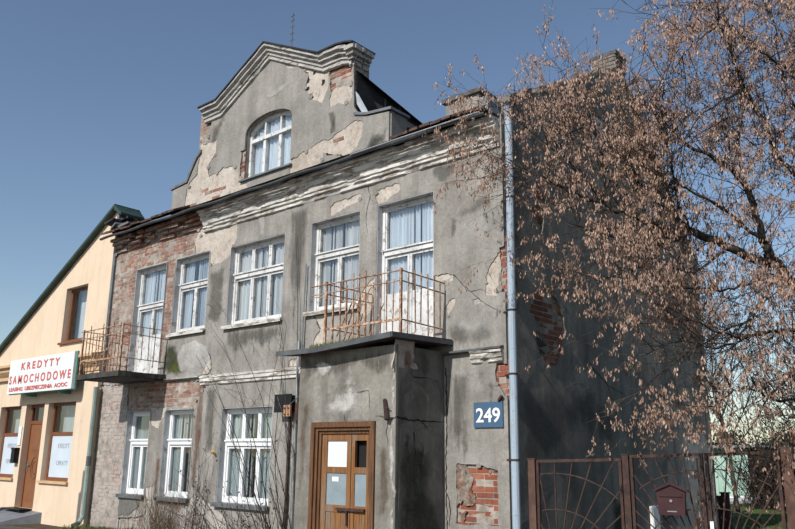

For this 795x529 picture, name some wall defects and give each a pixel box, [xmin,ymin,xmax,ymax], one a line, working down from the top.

peeling [303,65,356,107]
peeling [181,116,247,216]
peeling [290,120,363,175]
peeling [331,194,362,216]
peeling [373,183,400,204]
flaking render [107,223,239,372]
spalling [473,240,518,307]
flaking render [530,284,564,366]
flaking render [87,379,227,529]
crack [337,367,451,529]
leakage [401,437,437,529]
flaking render [456,463,499,526]